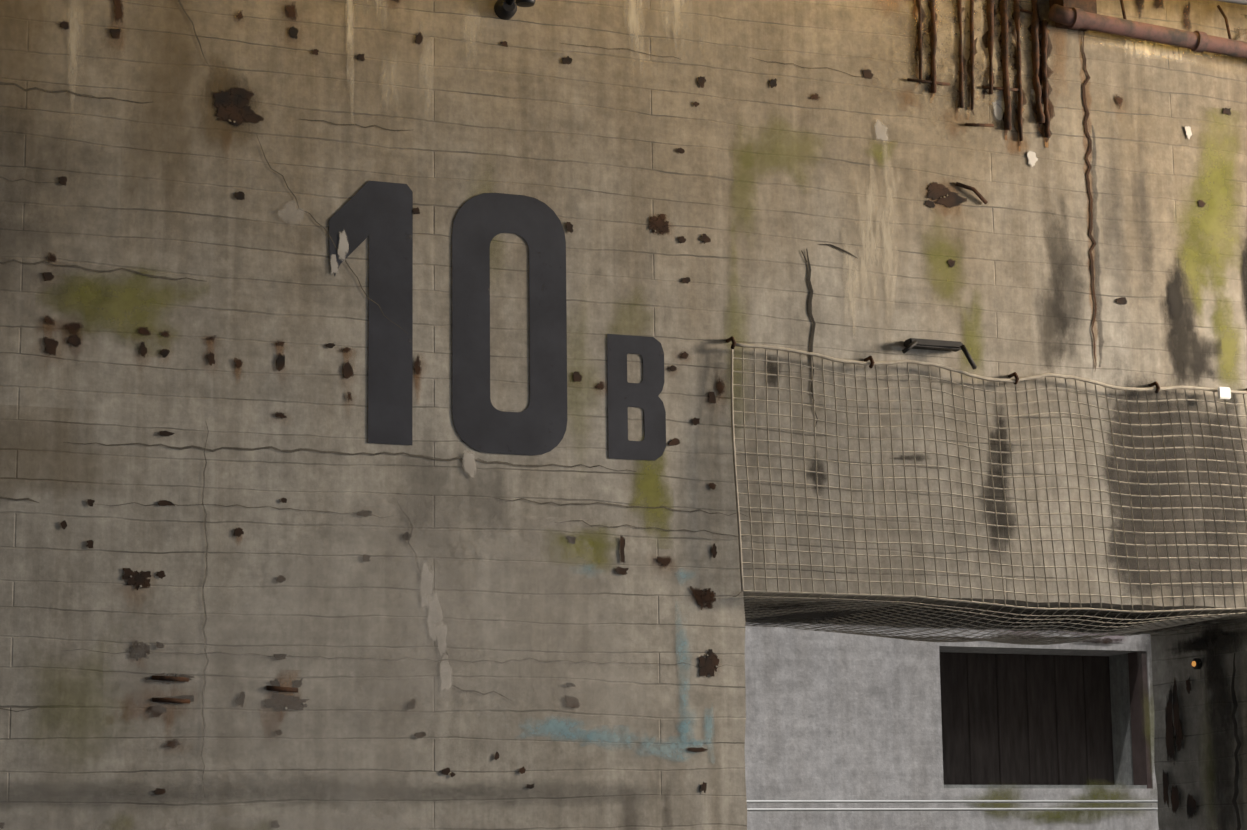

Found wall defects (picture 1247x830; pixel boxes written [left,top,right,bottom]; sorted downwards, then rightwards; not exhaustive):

spalling [206,74,264,138]
spalling [896,0,1055,167]
rust [43,316,84,355]
crack [801,244,857,427]
leakage [1167,242,1238,382]
leakage [984,412,1014,546]